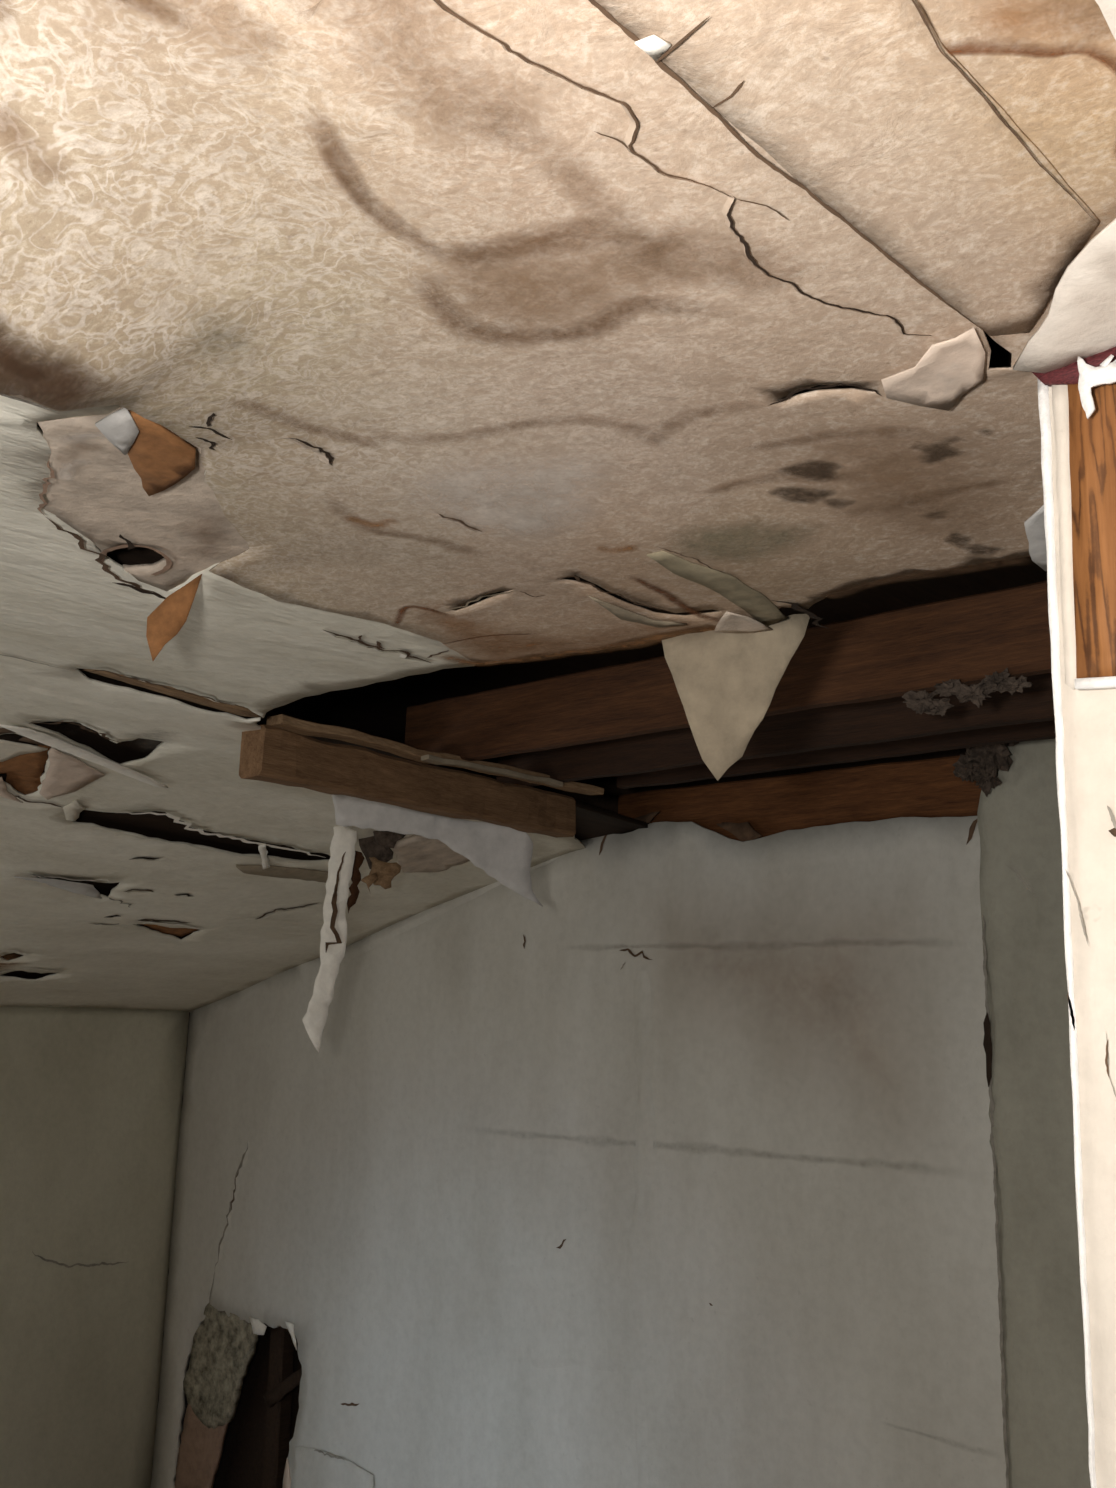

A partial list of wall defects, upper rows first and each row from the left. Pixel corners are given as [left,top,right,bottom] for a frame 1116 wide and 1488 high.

crack [433,0,931,336]
leakage [460,226,594,279]
leakage [0,329,88,405]
peeling [1077,355,1116,419]
flaking render [37,406,249,599]
leakage [780,462,843,506]
crack [318,630,449,663]
leakage [395,579,715,665]
peeling [0,739,105,821]
crack [209,1141,251,1304]
spalling [174,1303,267,1488]
spalling [283,1458,291,1488]